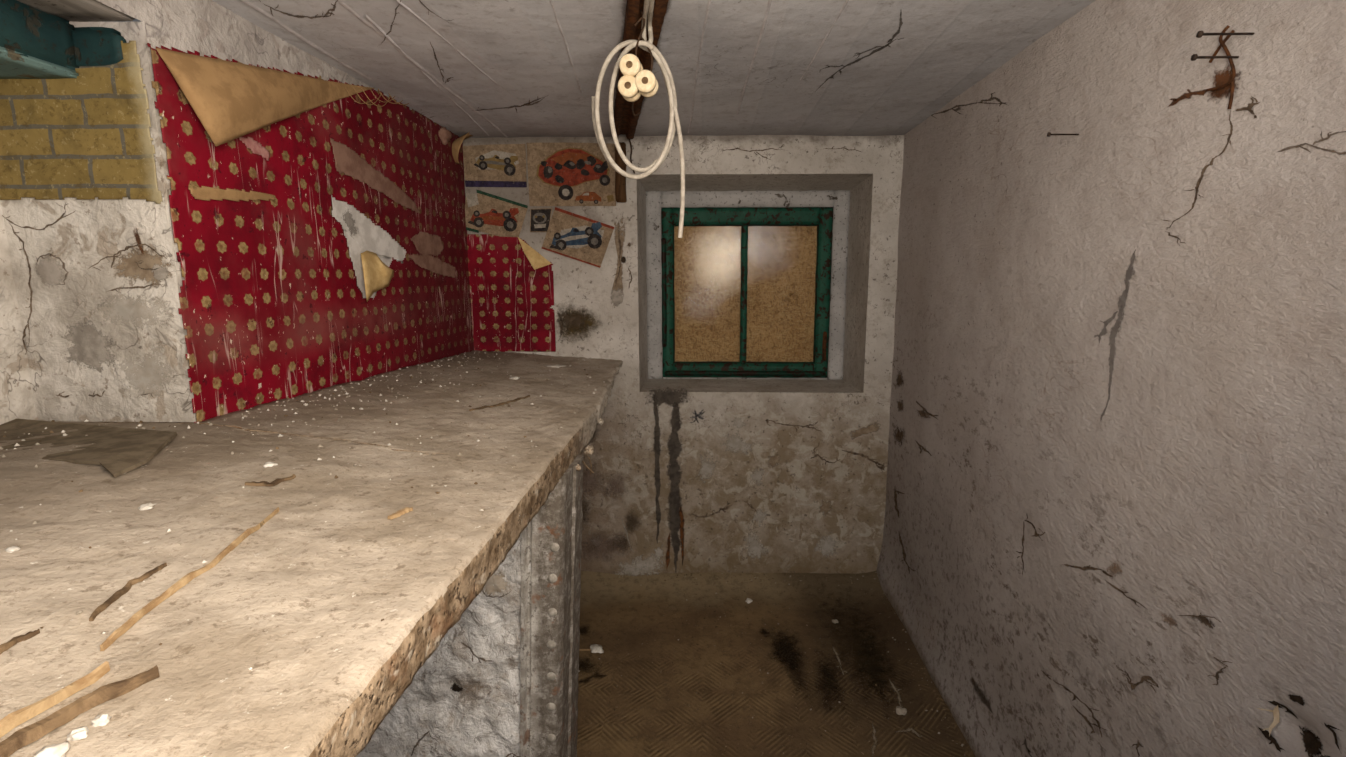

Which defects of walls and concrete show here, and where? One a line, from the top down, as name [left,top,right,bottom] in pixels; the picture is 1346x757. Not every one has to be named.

peeling [156,48,375,146]
crack [821,12,904,86]
corrosion [1168,67,1241,107]
crack [1164,96,1260,244]
crack [1278,131,1346,155]
crack [2,202,75,355]
peeling [61,229,175,397]
spalling [331,195,407,300]
damp [558,308,598,338]
crack [1094,250,1136,421]
damp [650,387,687,573]
damp [761,603,903,709]